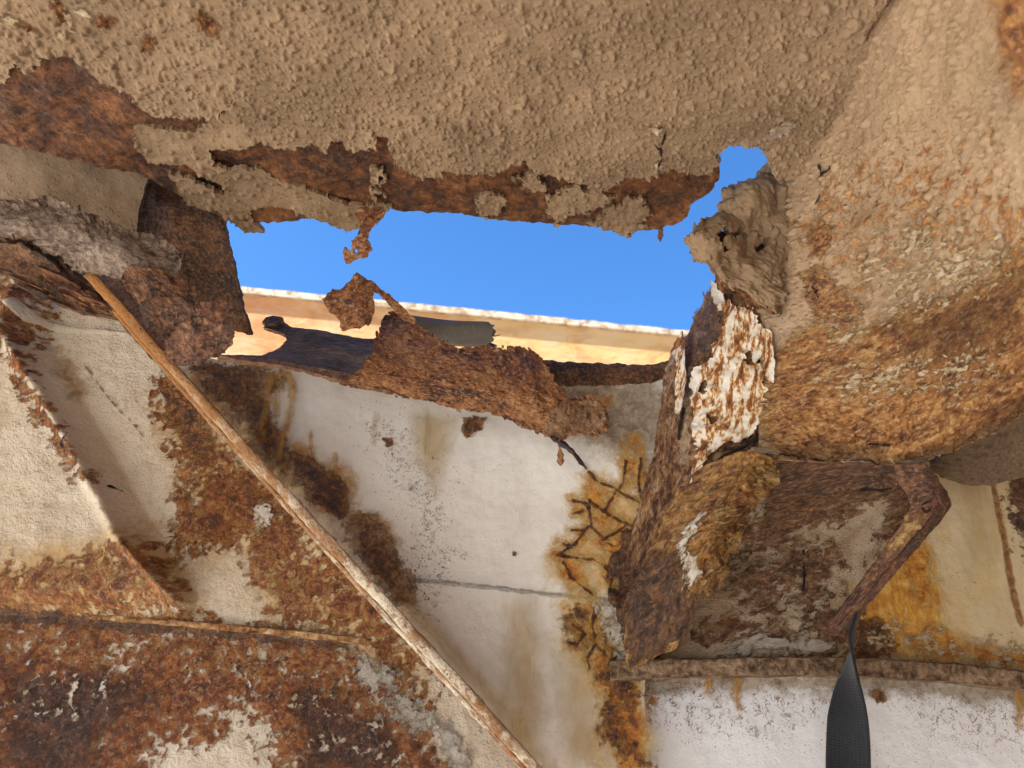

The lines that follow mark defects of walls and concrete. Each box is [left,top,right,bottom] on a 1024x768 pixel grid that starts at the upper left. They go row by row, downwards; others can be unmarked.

corrosion [0,53,225,197]
corrosion [0,236,449,768]
corrosion [212,136,720,331]
crack [550,456,645,671]
peeling [671,171,790,483]
corrosion [550,108,1024,768]